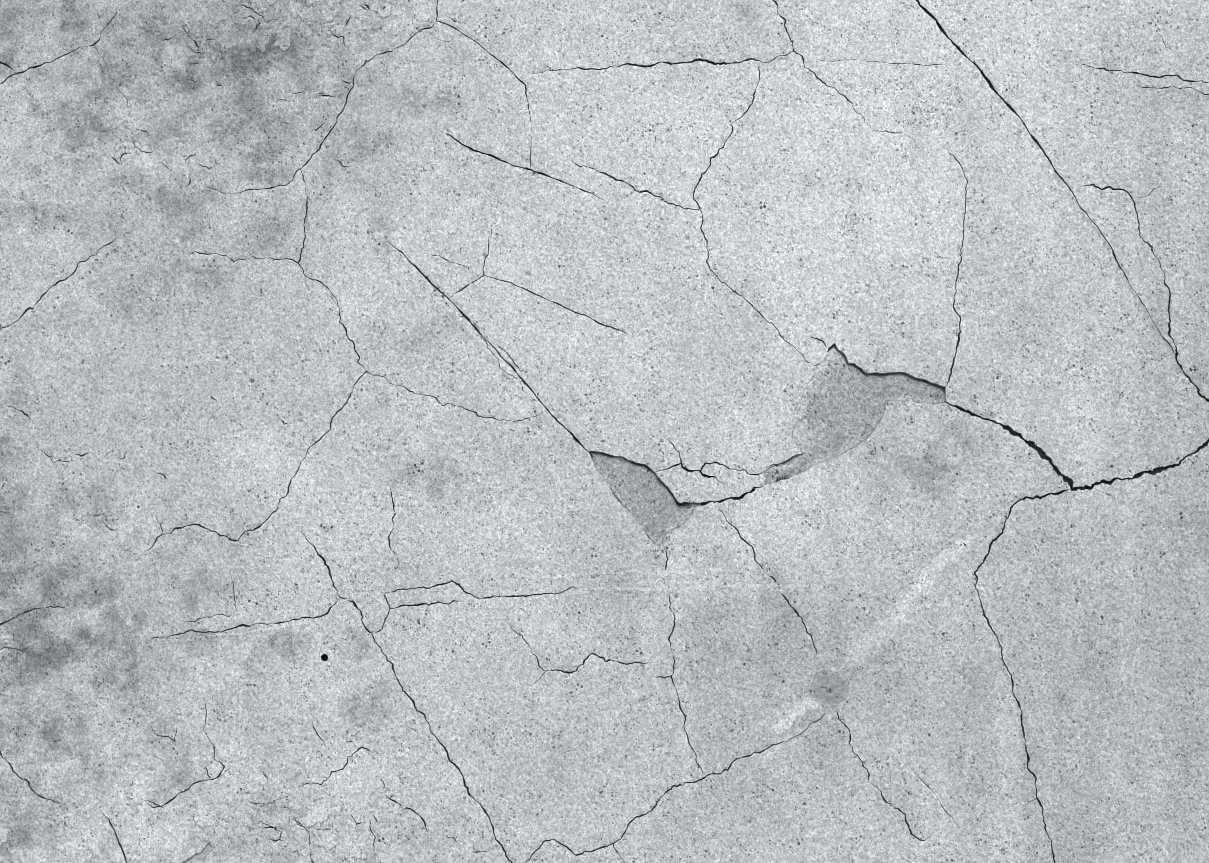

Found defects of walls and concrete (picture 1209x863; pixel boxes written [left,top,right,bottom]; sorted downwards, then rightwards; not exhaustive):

crack [0,0,1209,559]
spalling [763,343,946,485]
spalling [588,451,700,547]
crack [655,438,817,660]
crack [946,149,1209,863]
crack [0,606,65,651]
crack [130,485,958,863]
crack [0,750,62,805]
crack [101,811,127,863]